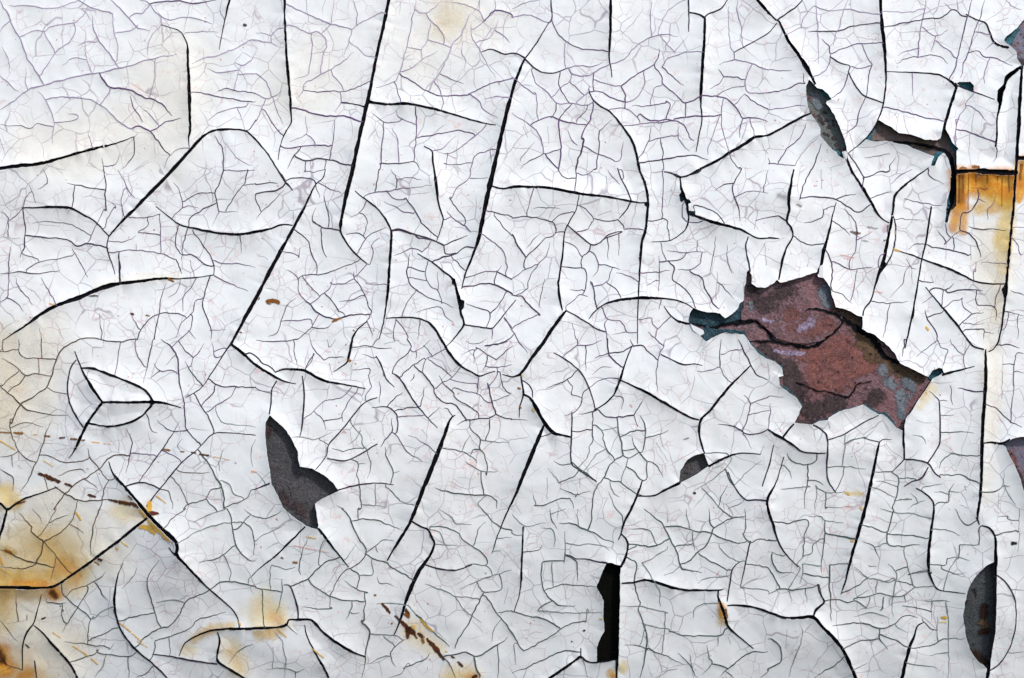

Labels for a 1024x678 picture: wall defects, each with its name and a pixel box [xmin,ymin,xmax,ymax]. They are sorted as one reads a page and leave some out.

crack [0,133,135,189]
peeling [806,81,847,159]
crack [900,67,1024,352]
rust [950,160,1024,249]
peeling [688,265,943,430]
peeling [266,416,337,529]
crack [304,625,329,678]
rust [374,594,478,678]
crack [512,648,619,678]
crack [538,542,609,613]
peeling [596,563,621,661]
peeling [963,563,995,667]